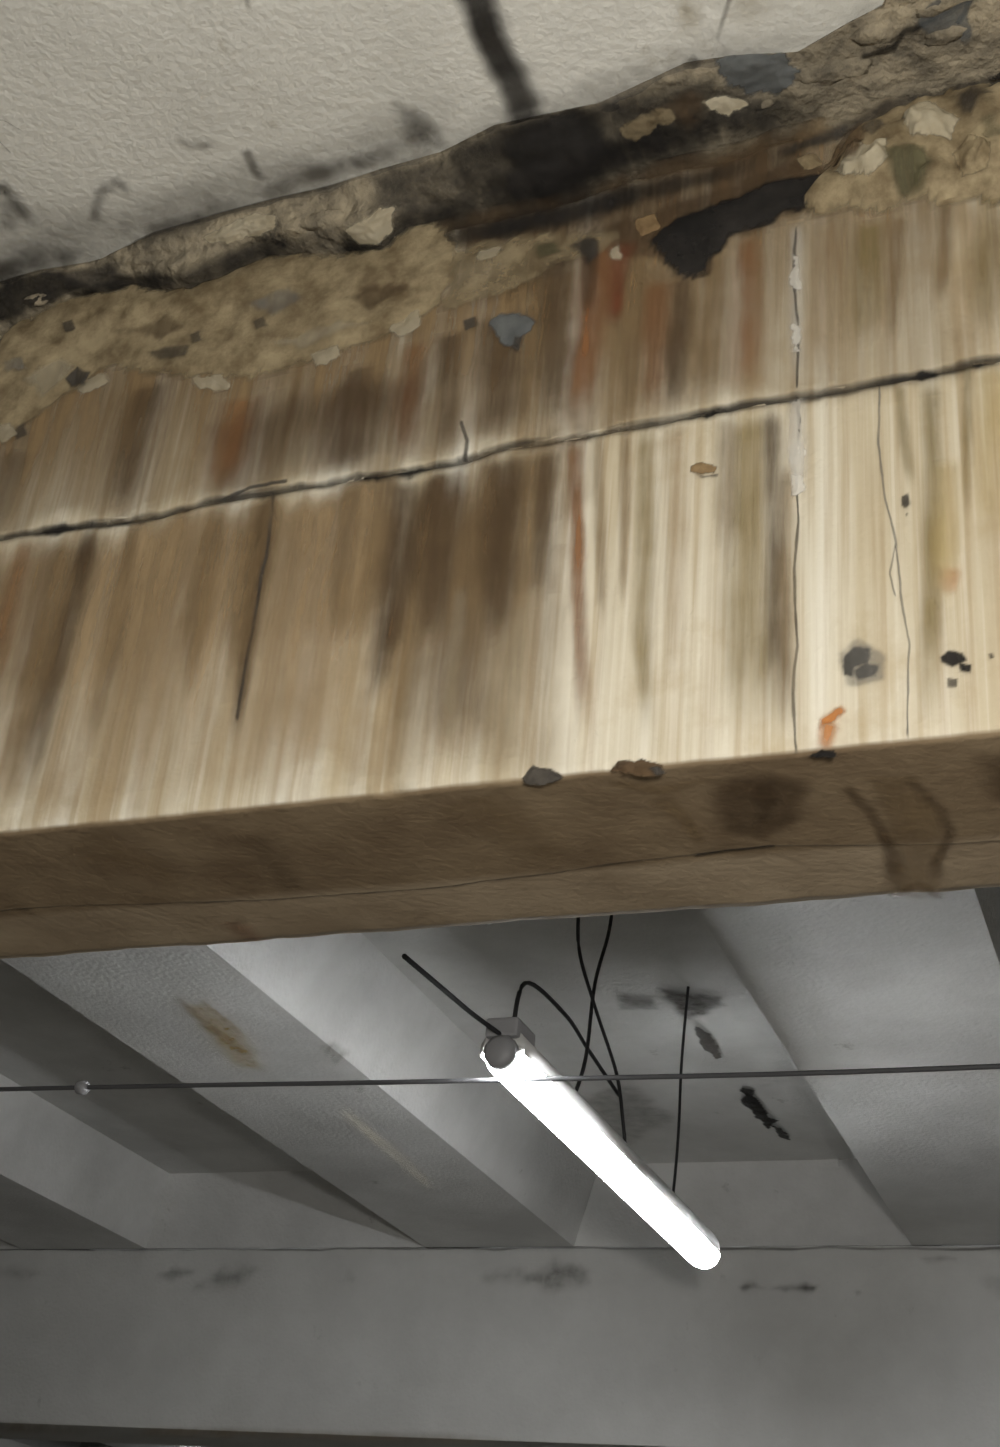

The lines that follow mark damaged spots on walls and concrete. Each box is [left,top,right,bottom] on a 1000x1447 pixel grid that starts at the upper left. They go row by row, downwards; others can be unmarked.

water stain [0,213,287,319]
peeling [0,73,1000,442]
water stain [344,79,1000,337]
water stain [0,258,575,512]
crack [0,230,1000,603]
water stain [0,447,555,718]
corrosion [573,487,583,655]
crack [792,472,800,649]
corrosion [821,707,844,745]
crack [904,673,912,733]
water stain [622,990,721,1059]
water stain [740,1088,790,1140]